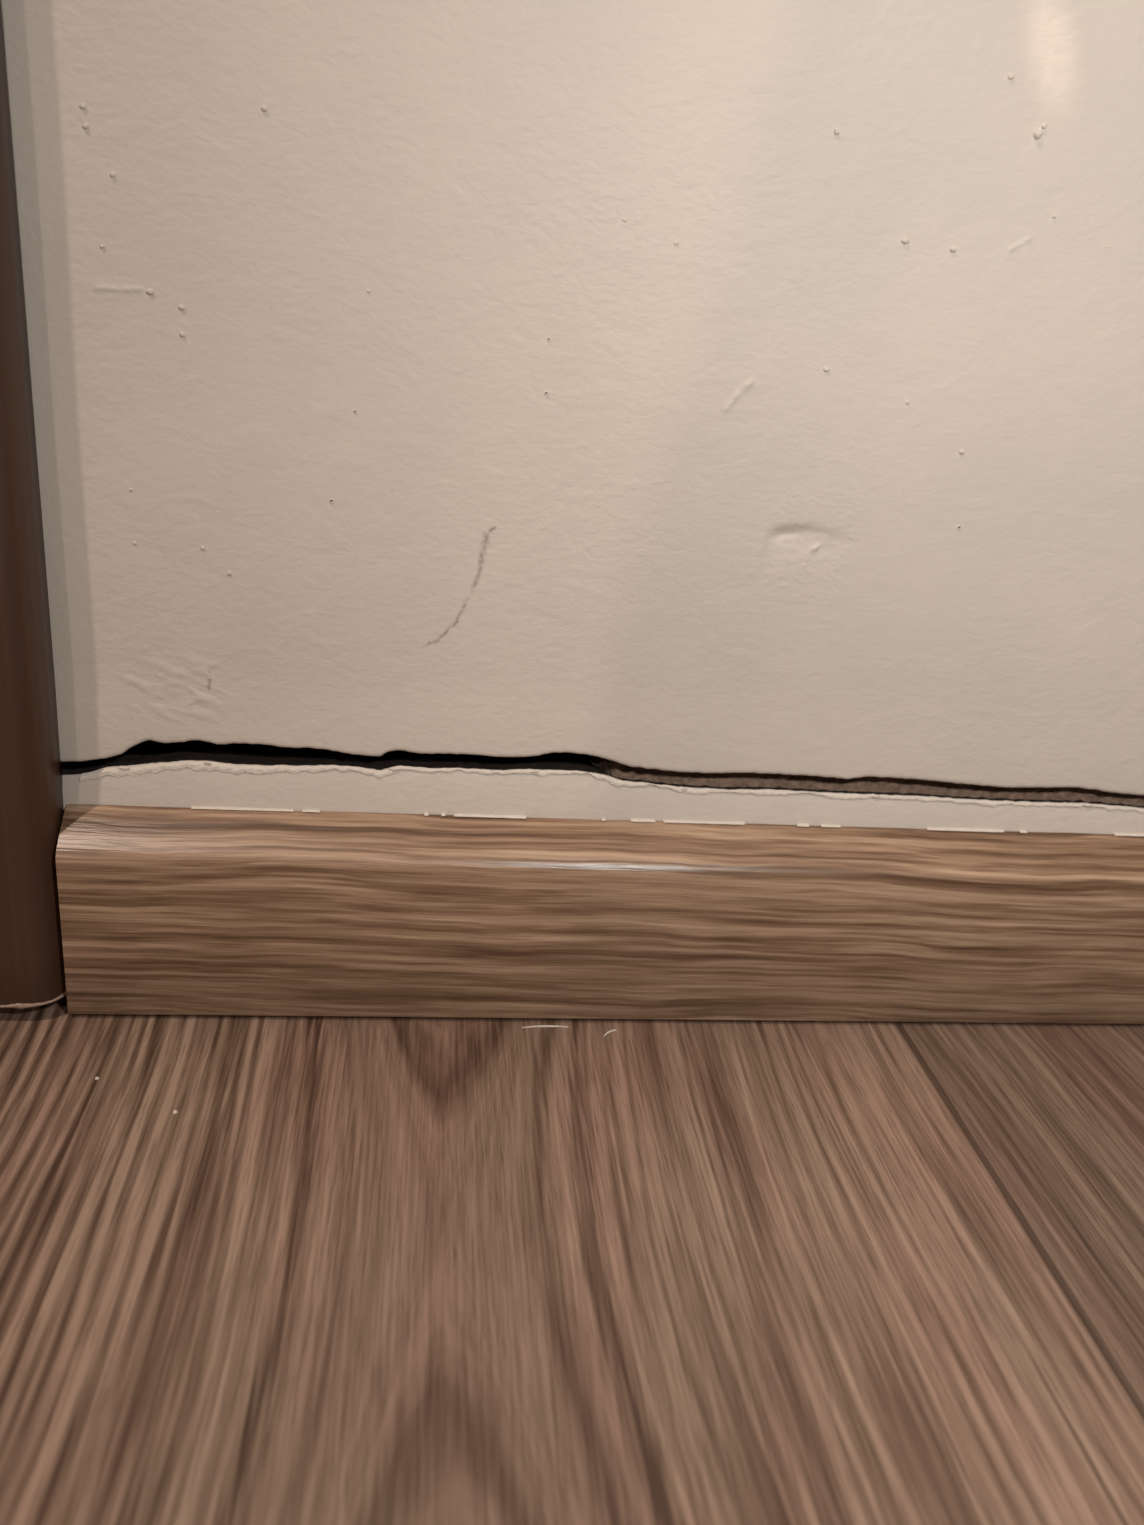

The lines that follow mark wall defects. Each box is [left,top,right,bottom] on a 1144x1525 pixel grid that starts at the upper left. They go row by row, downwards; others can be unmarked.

crack [61,740,1144,813]